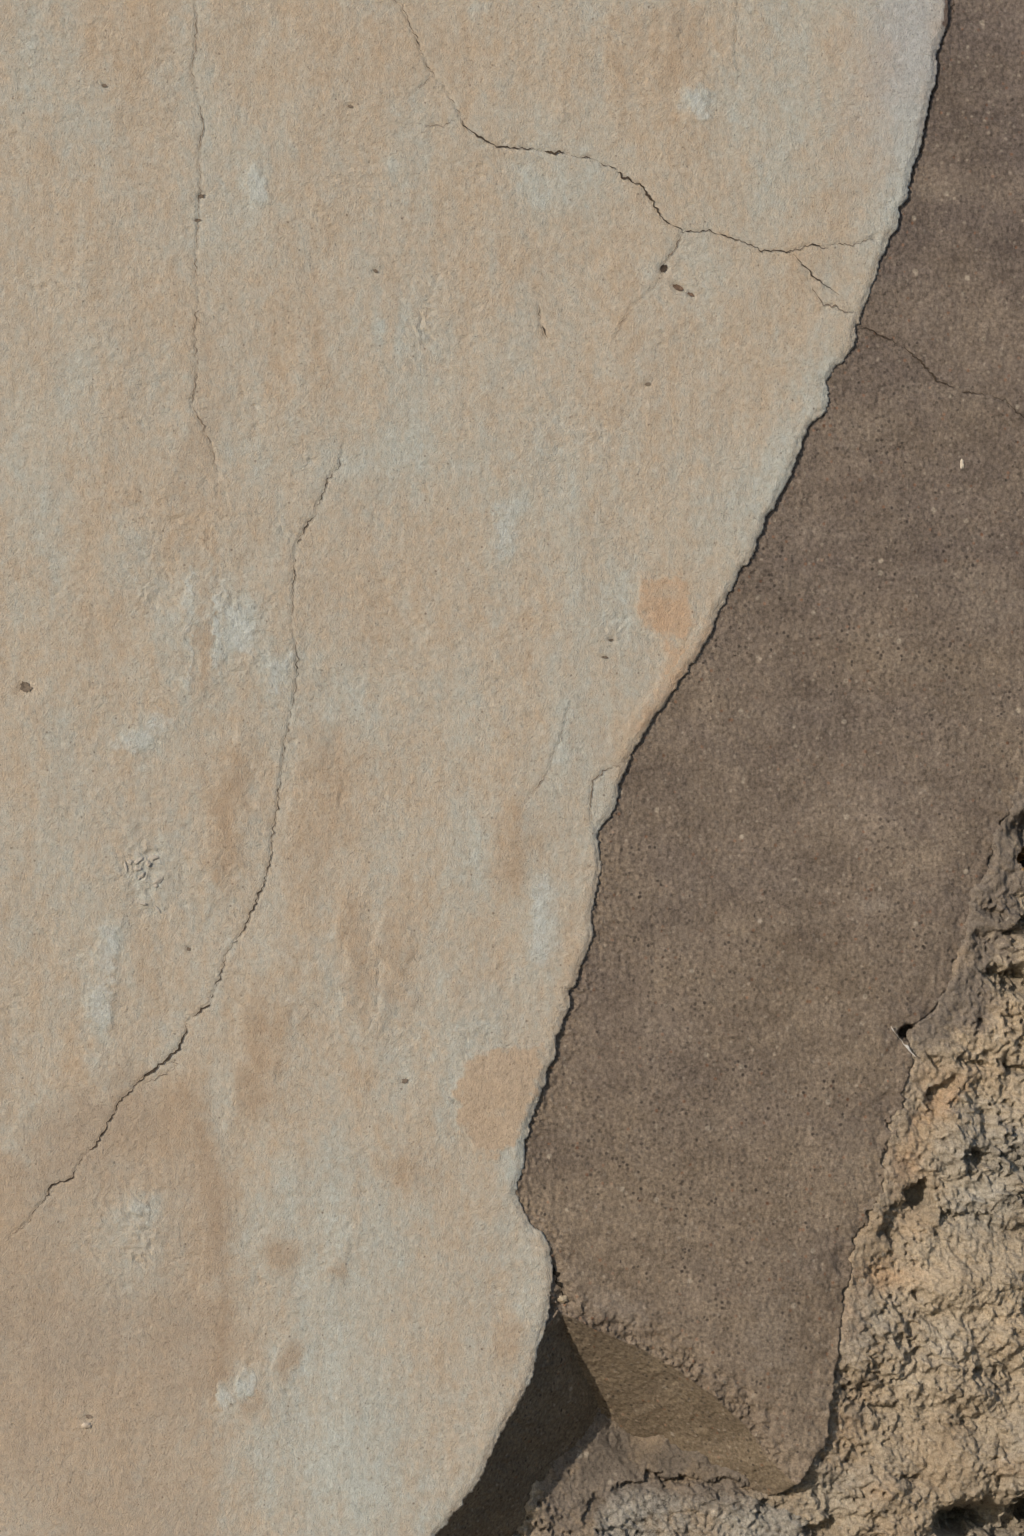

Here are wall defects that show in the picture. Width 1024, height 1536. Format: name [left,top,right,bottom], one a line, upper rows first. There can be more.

crack [191,17,219,486]
flaking render [660,264,694,297]
crack [396,0,1024,418]
crack [9,457,341,1237]
flaking render [446,1037,552,1163]
spalling [891,1025,916,1057]
spalling [437,1311,794,1536]